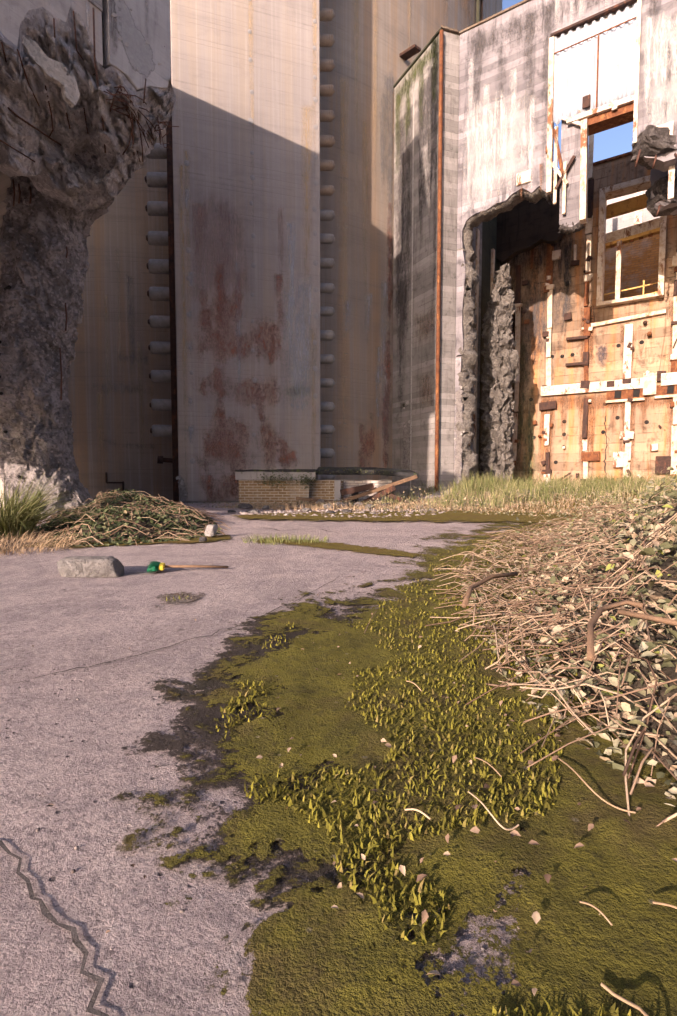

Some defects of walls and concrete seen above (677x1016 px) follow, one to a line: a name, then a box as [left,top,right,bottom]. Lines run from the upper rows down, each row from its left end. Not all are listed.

spalling [0,0,179,211]
leakage [367,42,439,415]
leakage [468,0,599,198]
spalling [631,125,677,217]
leakage [646,0,677,120]
spalling [454,187,553,489]
crack [0,840,109,1016]